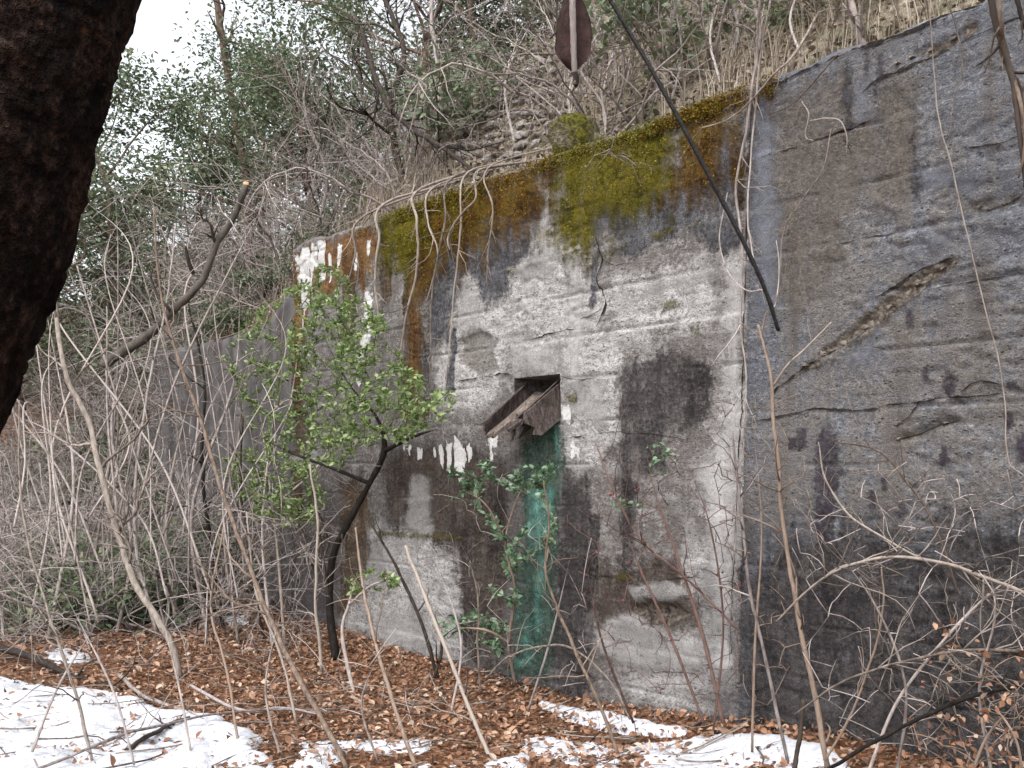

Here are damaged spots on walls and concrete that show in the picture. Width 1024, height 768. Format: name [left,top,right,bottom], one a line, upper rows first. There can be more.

corrosion [291,219,435,524]
water stain [382,105,1024,768]
spalling [774,257,957,392]
crack [737,211,1007,471]